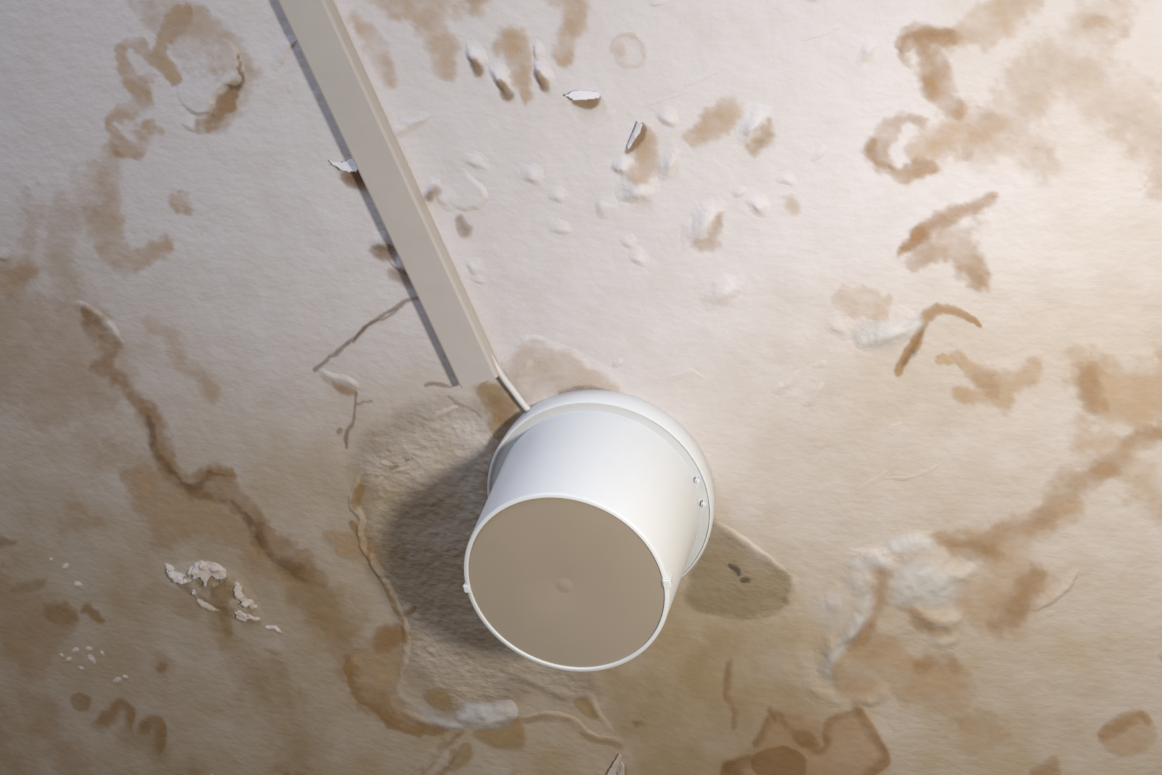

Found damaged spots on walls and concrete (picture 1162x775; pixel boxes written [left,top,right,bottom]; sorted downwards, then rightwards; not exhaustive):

leakage [916,31,955,58]
leakage [149,39,181,85]
peeling [176,36,244,135]
leakage [218,91,238,118]
peeling [565,90,600,100]
leakage [923,72,939,98]
peeling [627,122,642,149]
peeling [329,159,358,173]
leakage [900,224,931,253]
leakage [129,444,311,580]
spalling [690,528,788,615]
leakage [100,701,165,751]